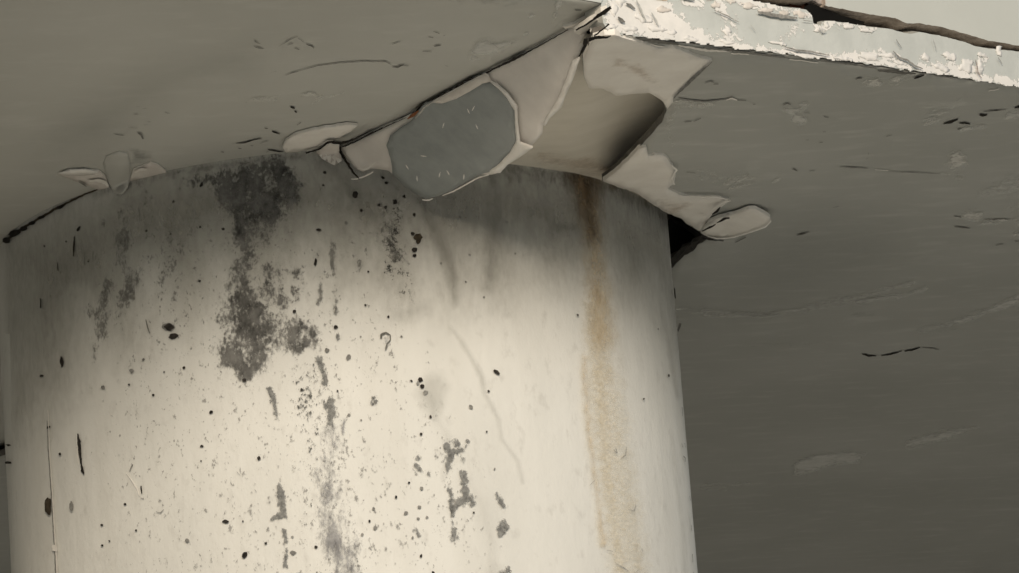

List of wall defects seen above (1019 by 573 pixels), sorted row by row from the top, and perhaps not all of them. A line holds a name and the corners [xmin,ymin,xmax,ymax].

crack [789,0,874,27]
crack [238,6,612,179]
peeling [283,0,1019,239]
peeling [58,168,109,190]
peeling [130,161,166,181]
corrosion [570,172,598,271]
damp [44,156,600,573]
crack [862,347,939,357]